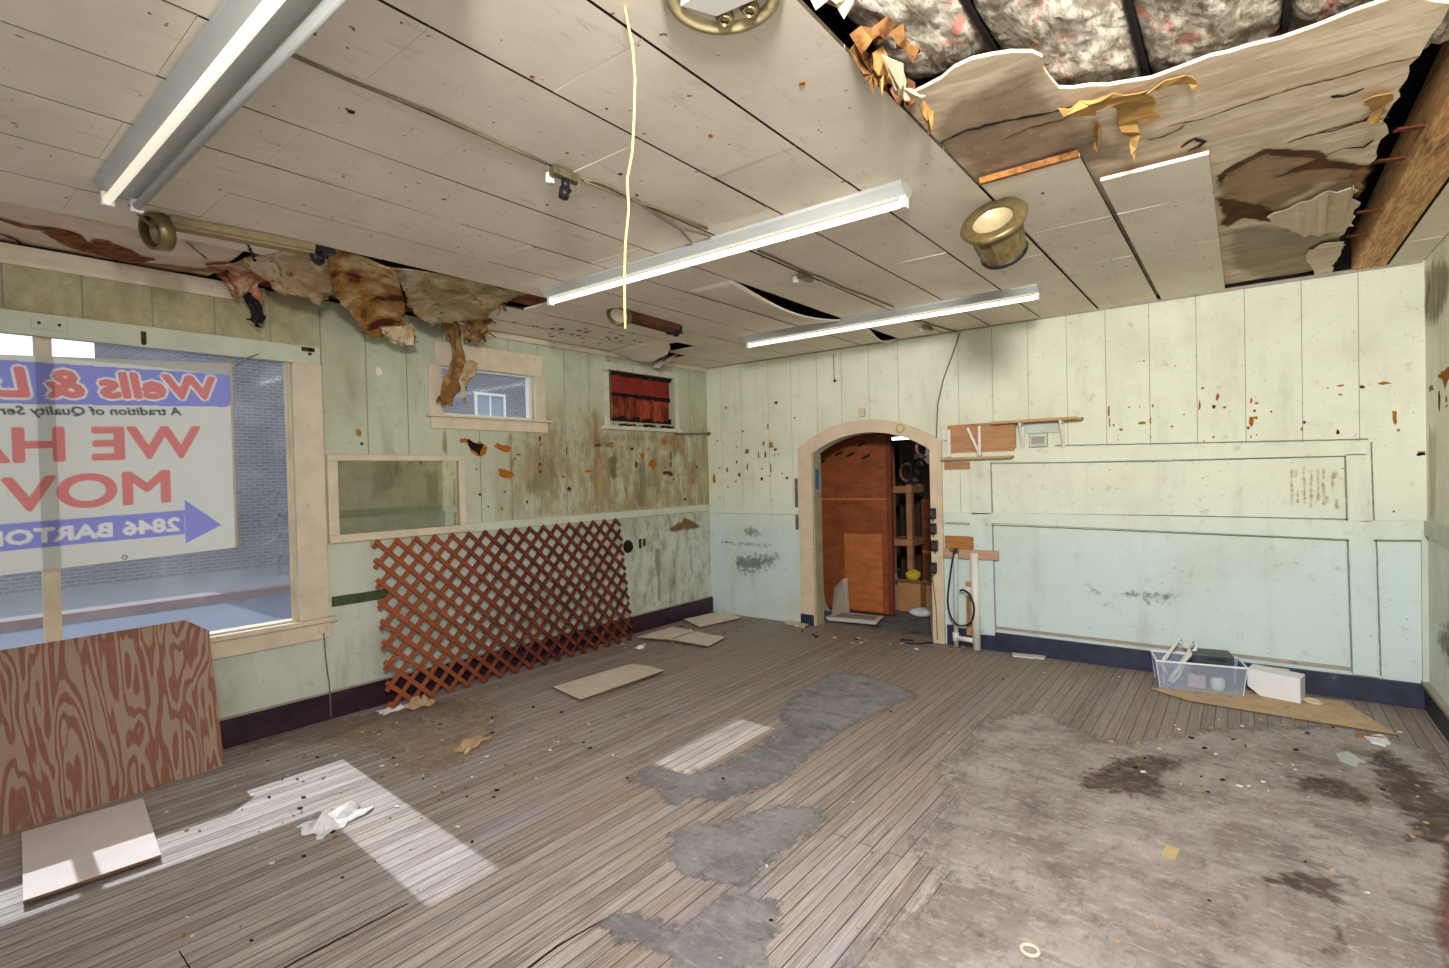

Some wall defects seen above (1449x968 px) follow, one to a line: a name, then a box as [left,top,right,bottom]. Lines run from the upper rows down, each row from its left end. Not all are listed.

water stain [1424,264,1448,321]
water stain [593,418,617,502]